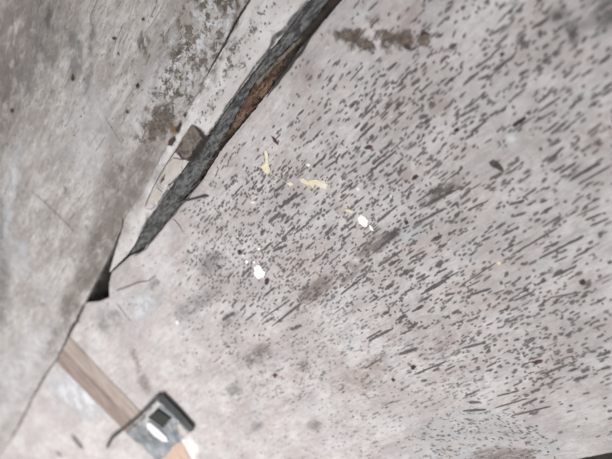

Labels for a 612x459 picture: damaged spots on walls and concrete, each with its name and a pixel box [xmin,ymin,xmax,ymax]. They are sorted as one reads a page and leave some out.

crack [128,0,342,258]
crack [9,306,84,442]